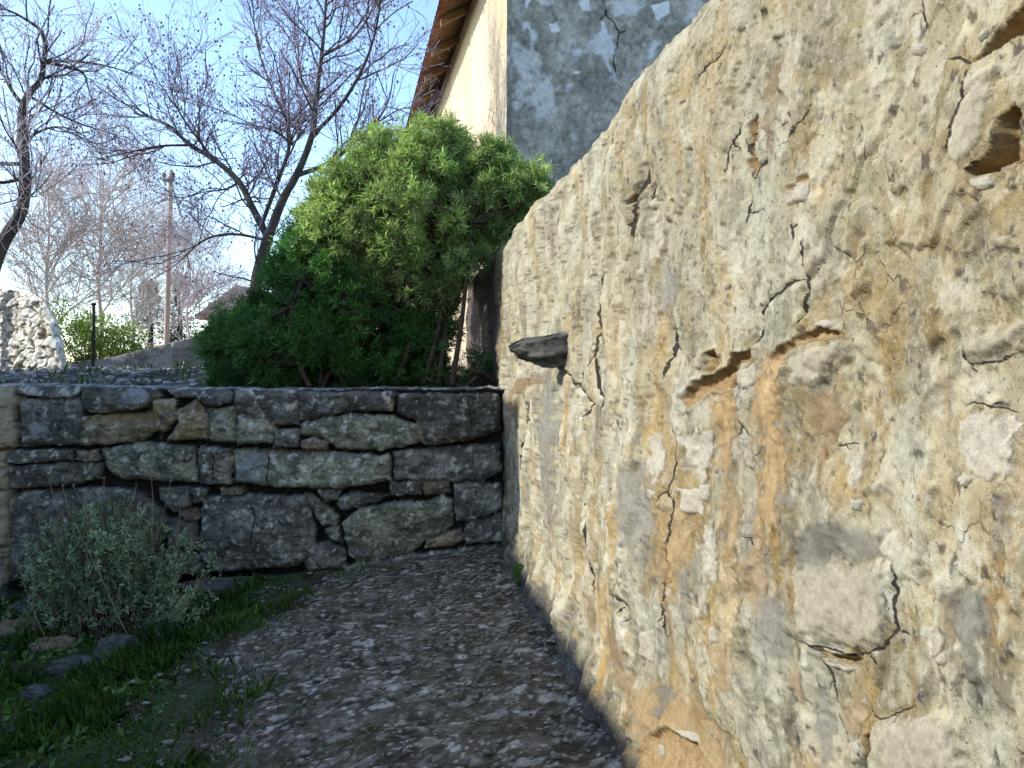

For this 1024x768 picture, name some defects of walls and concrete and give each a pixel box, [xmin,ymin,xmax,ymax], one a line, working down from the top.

flaking render [523,22,537,51]
flaking render [572,0,670,83]
crack [945,56,970,148]
spalling [968,108,1024,190]
crack [624,167,658,248]
crack [755,219,811,343]
crack [564,272,605,419]
crack [662,331,682,379]
spalling [680,349,757,410]
spalling [773,319,844,365]
crack [656,425,677,544]
crack [795,562,909,699]